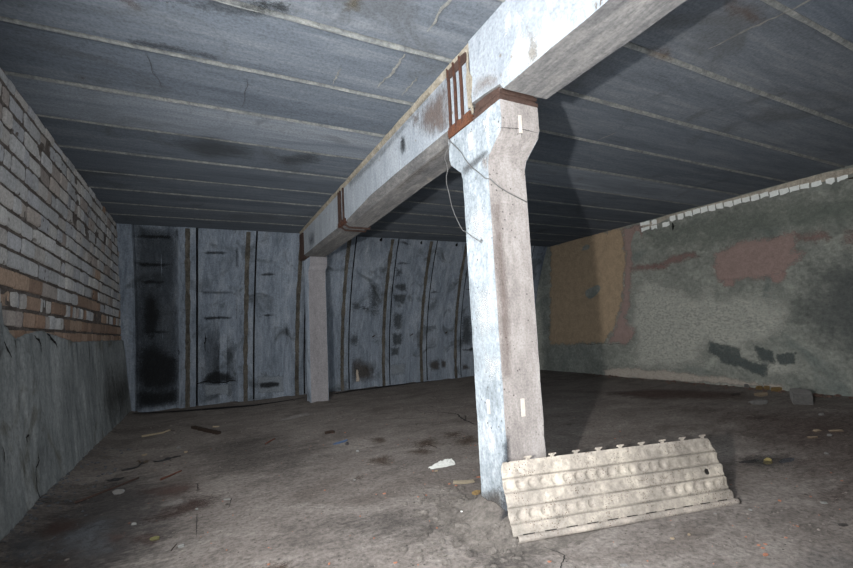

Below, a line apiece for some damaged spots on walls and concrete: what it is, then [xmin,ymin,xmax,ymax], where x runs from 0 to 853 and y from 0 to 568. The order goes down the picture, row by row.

leakage [137,347,178,407]